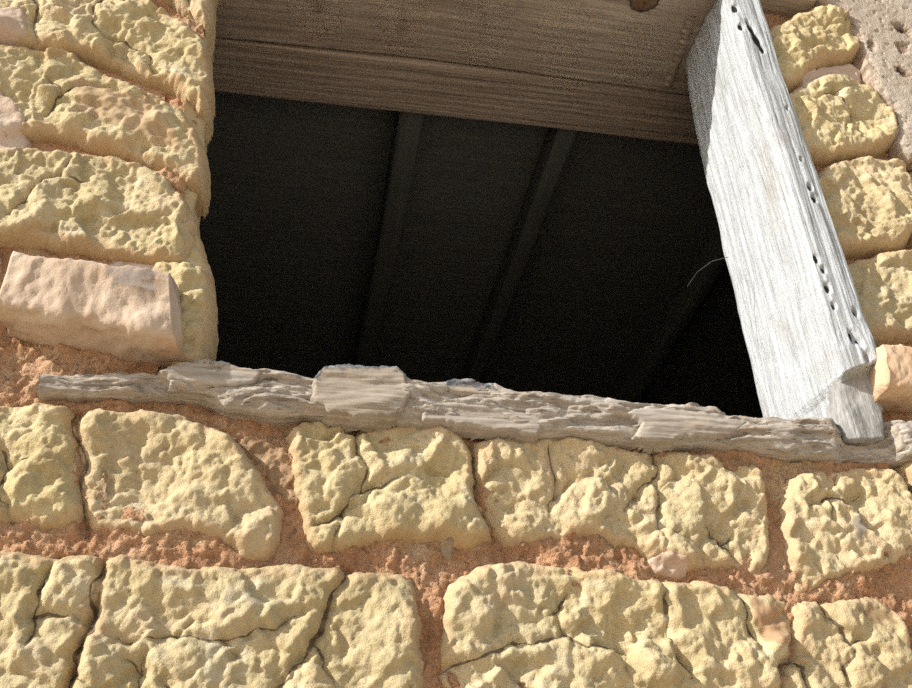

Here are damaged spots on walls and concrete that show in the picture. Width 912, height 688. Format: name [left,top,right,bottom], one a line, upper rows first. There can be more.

crack [32,0,40,45]
crack [91,0,153,72]
crack [0,449,32,514]
crack [71,415,88,529]
crack [315,431,395,545]
crack [627,454,660,530]
crack [26,560,104,688]
crack [119,615,298,688]
crack [277,574,346,688]
crack [442,599,620,673]
crack [663,589,692,675]
crack [820,608,860,687]